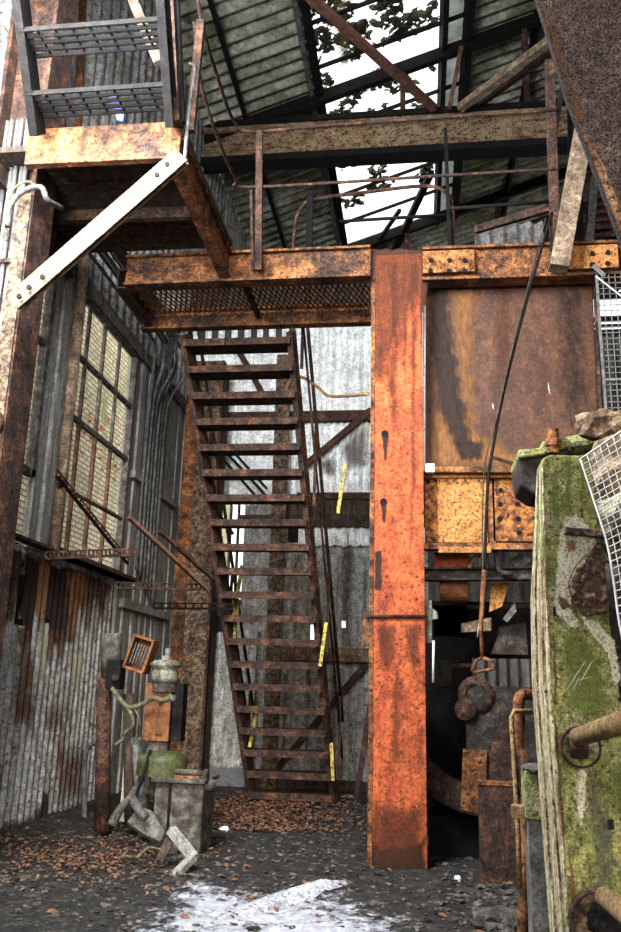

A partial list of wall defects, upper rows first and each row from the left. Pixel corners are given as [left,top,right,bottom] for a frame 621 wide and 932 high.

rust [428,287,516,466]
water stain [553,462,584,520]
rust [6,549,24,620]
rust [34,557,51,631]
rust [63,567,110,643]
rust [0,791,49,832]
water stain [577,768,611,888]